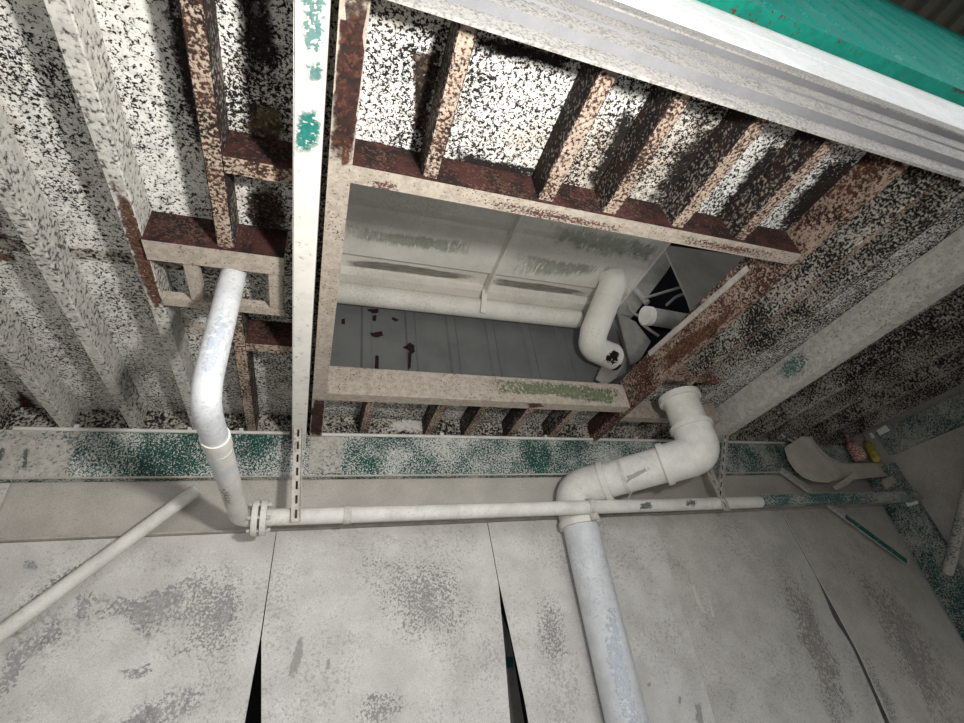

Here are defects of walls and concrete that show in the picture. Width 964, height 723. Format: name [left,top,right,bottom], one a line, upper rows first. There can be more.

corrosion [331,0,367,165]
corrosion [682,236,775,258]
corrosion [657,307,738,371]
corrosion [587,412,619,435]